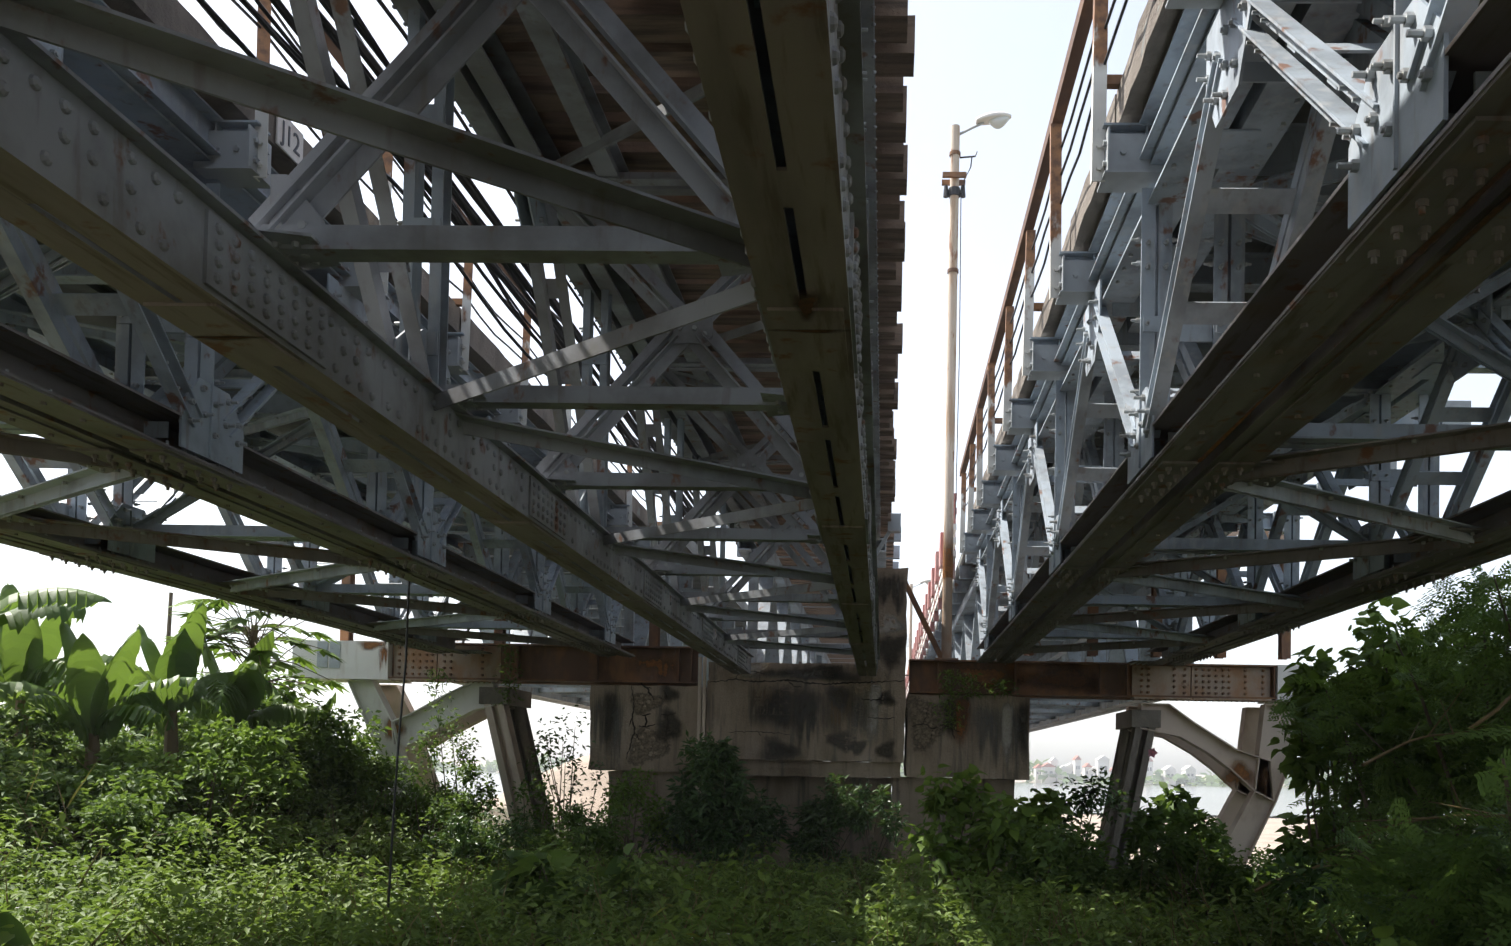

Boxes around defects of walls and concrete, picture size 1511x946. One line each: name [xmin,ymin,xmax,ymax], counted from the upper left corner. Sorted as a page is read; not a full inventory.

leakage [753,664,895,759]
leakage [978,704,1029,762]